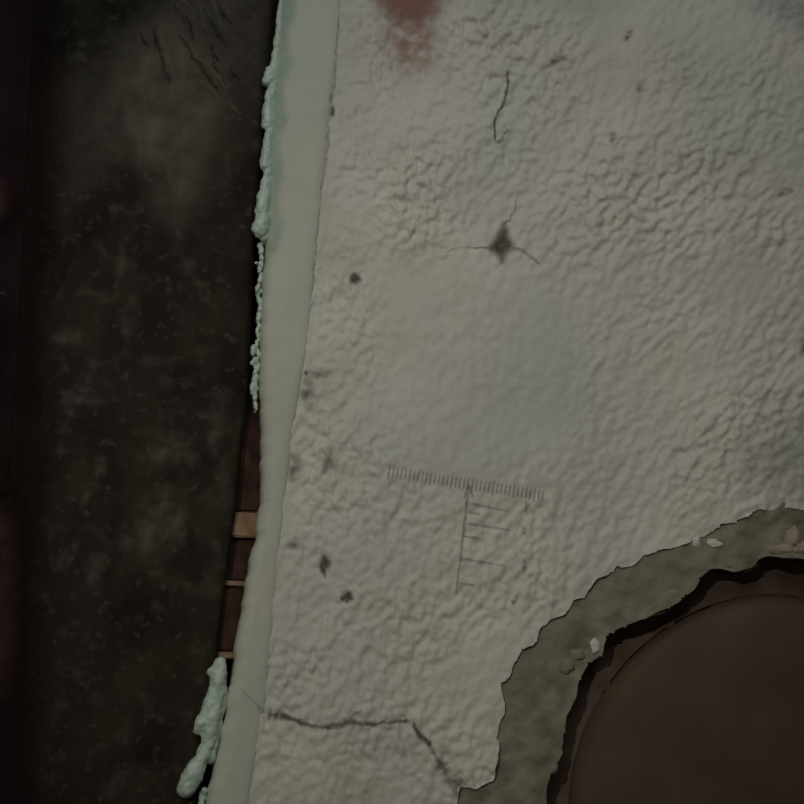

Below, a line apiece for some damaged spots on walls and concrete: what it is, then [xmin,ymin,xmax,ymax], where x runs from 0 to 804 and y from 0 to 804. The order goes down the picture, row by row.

crack [494,73,509,142]
flaking render [457,502,804,804]
crack [269,713,458,784]